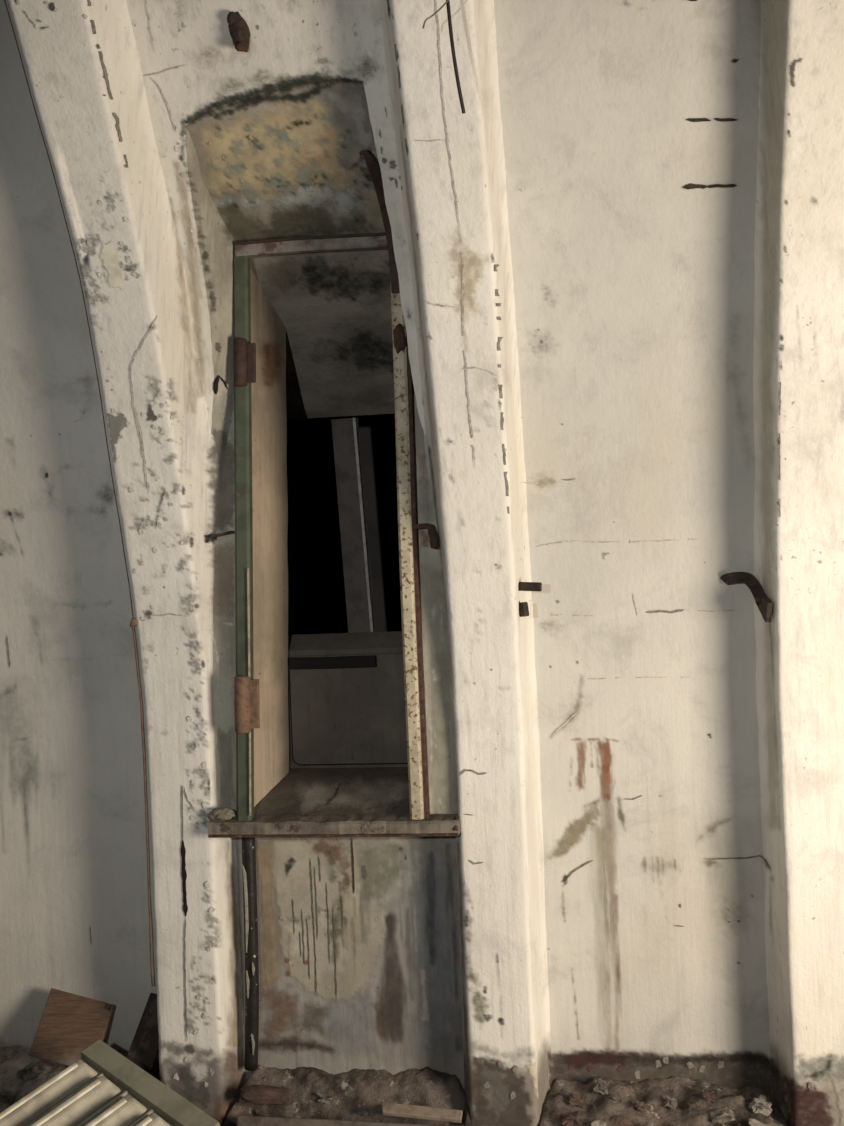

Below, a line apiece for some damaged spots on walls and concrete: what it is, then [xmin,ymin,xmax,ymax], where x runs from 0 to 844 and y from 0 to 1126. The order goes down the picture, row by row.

damp [185,63,373,186]
mould [220,203,366,241]
damp [340,334,394,372]
corrosion [571,738,615,939]